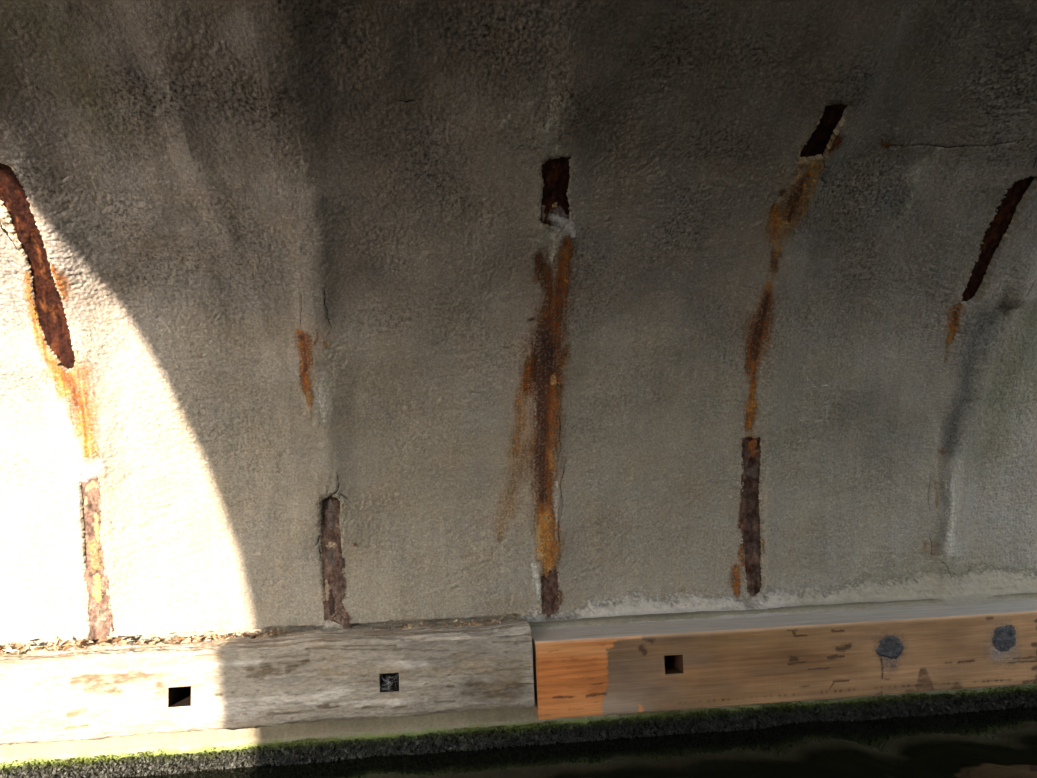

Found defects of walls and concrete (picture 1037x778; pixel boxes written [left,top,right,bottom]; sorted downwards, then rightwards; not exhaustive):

spalling [796,102,852,162]
spalling [0,163,77,369]
corrosion [50,265,68,301]
corrosion [24,272,99,458]
corrosion [295,329,327,412]
corrosion [498,235,574,577]
spalling [540,157,572,229]
corrosion [744,133,843,438]
corrosion [946,303,963,360]
spalling [961,176,1035,302]
leakage [939,461,959,555]
corrosion [731,544,744,598]